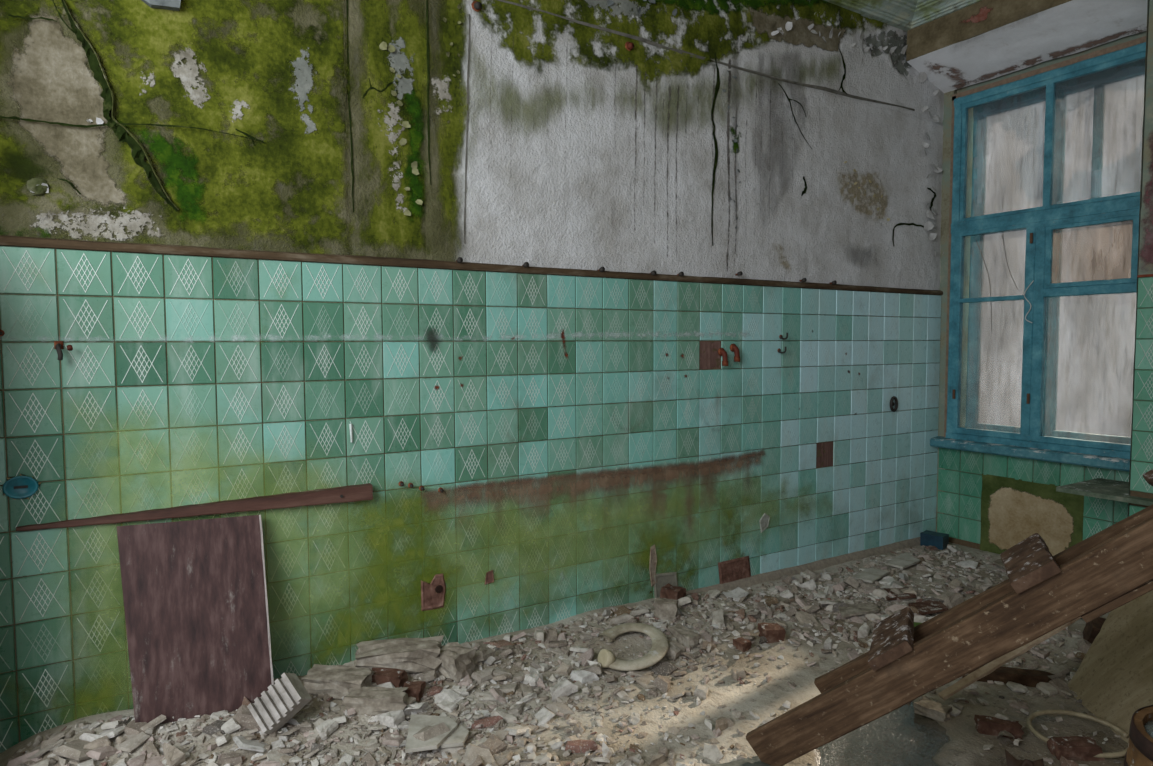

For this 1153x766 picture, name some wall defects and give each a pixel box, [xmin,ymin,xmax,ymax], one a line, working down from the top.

leakage [4,152,51,180]
flaking render [7,11,162,241]
crack [0,0,265,212]
crack [346,0,431,212]
crack [463,14,471,244]
leakage [635,65,679,237]
crack [498,0,915,246]
leakage [713,60,756,269]
corrosion [427,451,764,506]
peeling [700,341,721,369]
peeling [816,442,833,468]
peeling [980,474,1084,556]